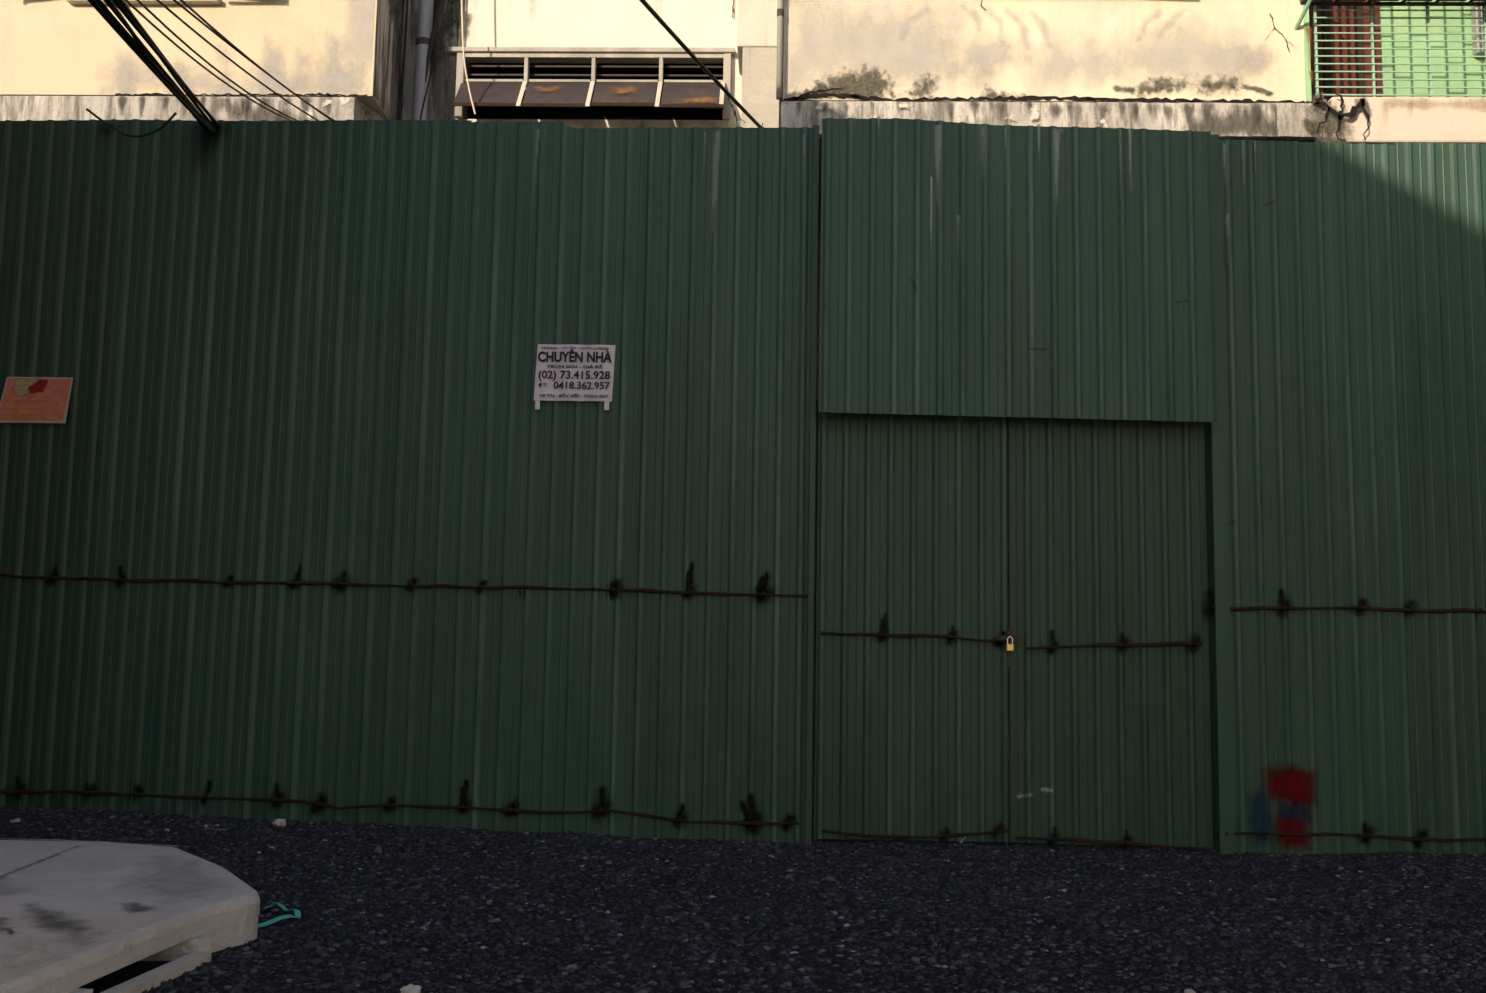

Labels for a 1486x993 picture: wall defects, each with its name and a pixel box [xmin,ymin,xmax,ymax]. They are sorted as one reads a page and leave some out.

leakage [118,69,154,111]
leakage [164,0,404,121]
leakage [788,13,1031,154]
leakage [1098,33,1277,179]